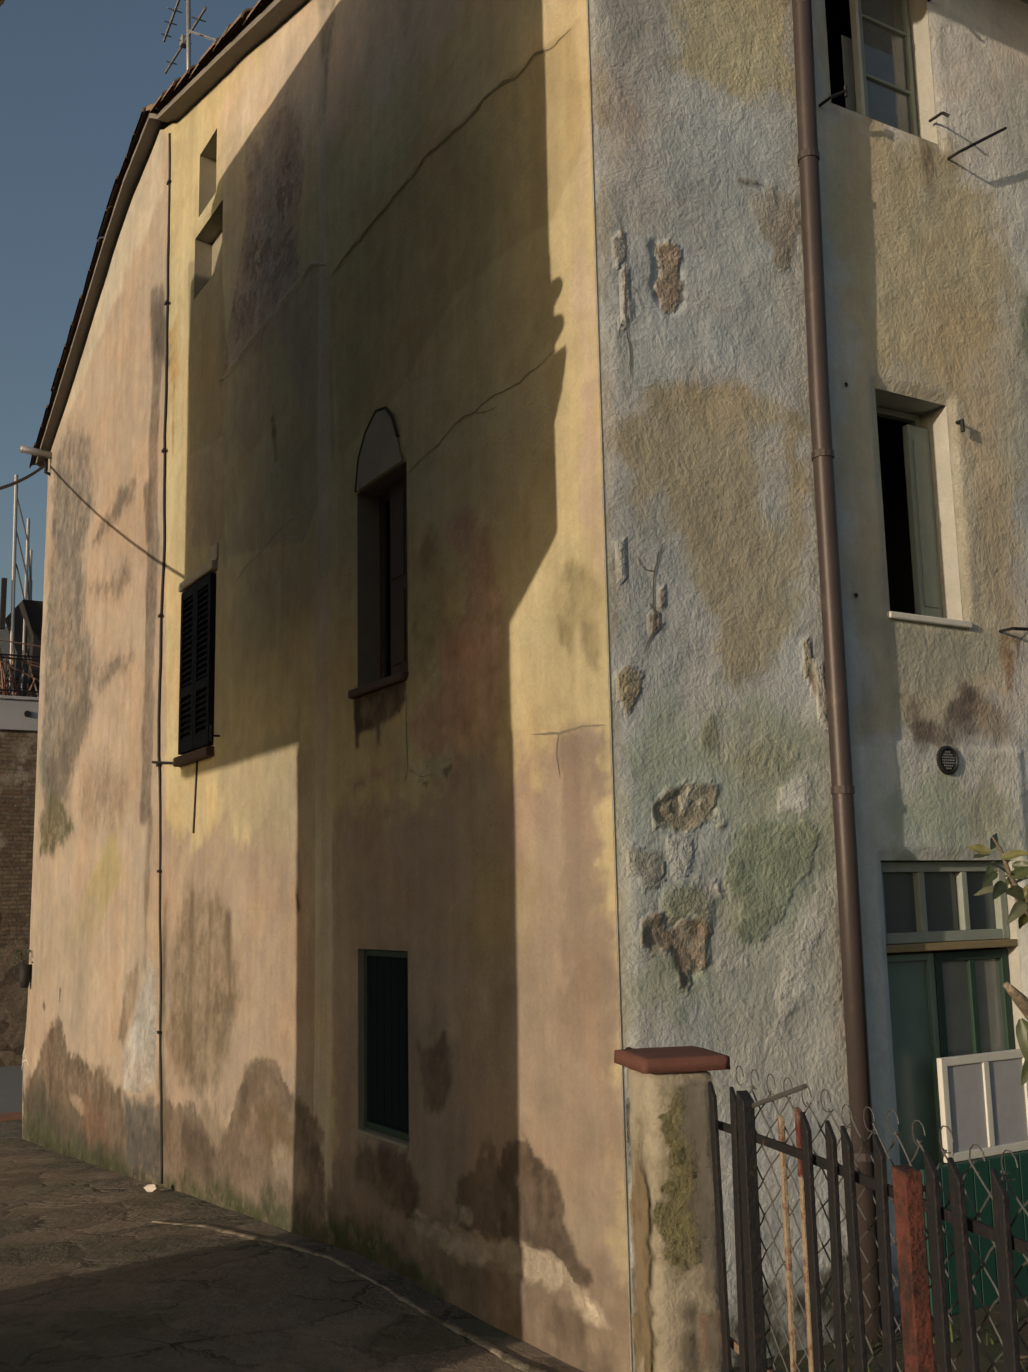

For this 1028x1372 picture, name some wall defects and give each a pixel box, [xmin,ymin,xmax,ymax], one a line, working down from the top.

crack [618,213,643,381]
flaking render [608,228,686,334]
crack [407,348,557,475]
crack [638,542,664,656]
peeling [611,660,646,719]
damp [888,676,1028,766]
damp [22,277,653,1372]
flaking render [621,777,756,997]
peeling [764,864,846,1063]
flaking render [406,1200,613,1336]
damp [680,1076,749,1372]
damp [763,1232,853,1358]